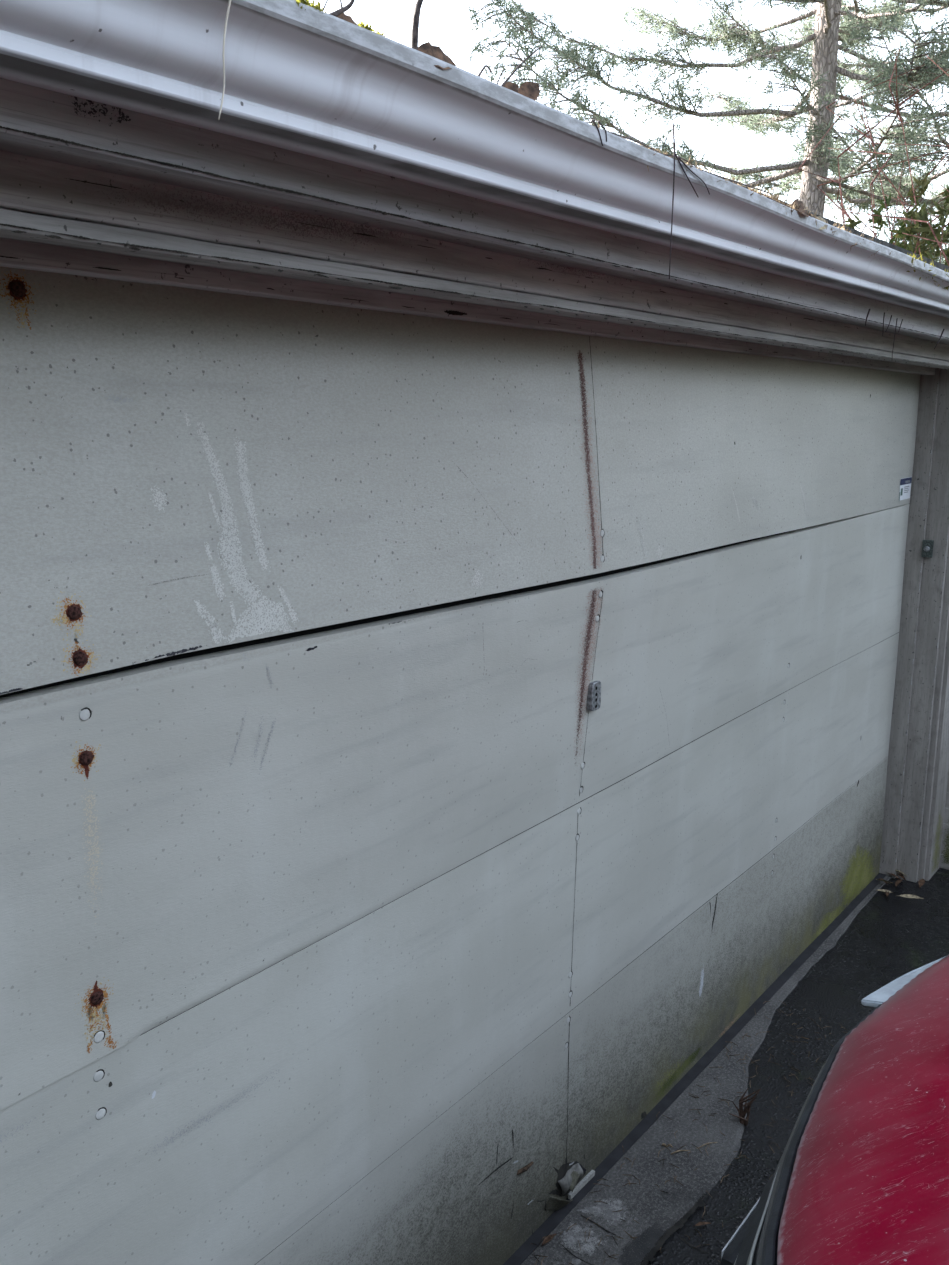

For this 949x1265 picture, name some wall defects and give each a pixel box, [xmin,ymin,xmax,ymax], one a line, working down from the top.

rust [577,350,604,569]
rust [50,591,100,676]
rust [573,586,604,773]
rust [70,740,103,924]
rust [75,977,117,1053]